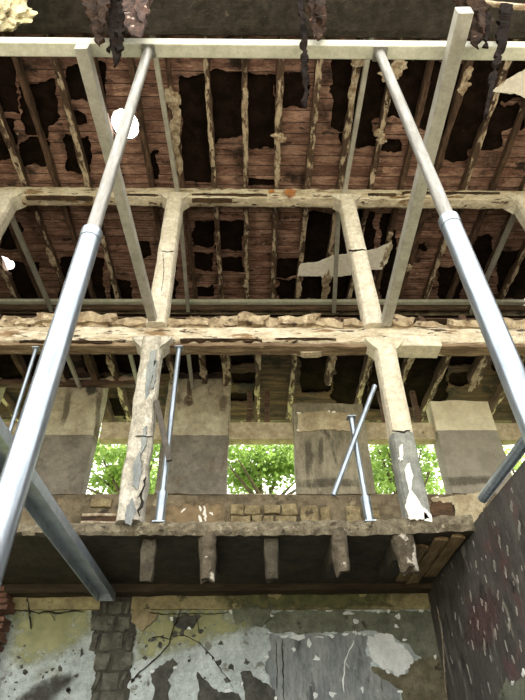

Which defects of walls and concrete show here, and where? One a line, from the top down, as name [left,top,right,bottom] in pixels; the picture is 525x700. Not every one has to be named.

spalling [0,312,54,327]
spalling [76,311,147,328]
spalling [167,311,364,329]
spalling [384,314,480,330]
spalling [503,317,525,329]
crack [137,477,147,517]
flaking render [398,445,487,522]
crack [17,597,84,629]
peeling [461,590,492,662]
flaking render [73,597,215,700]
crack [131,610,232,686]
peeling [196,602,453,700]